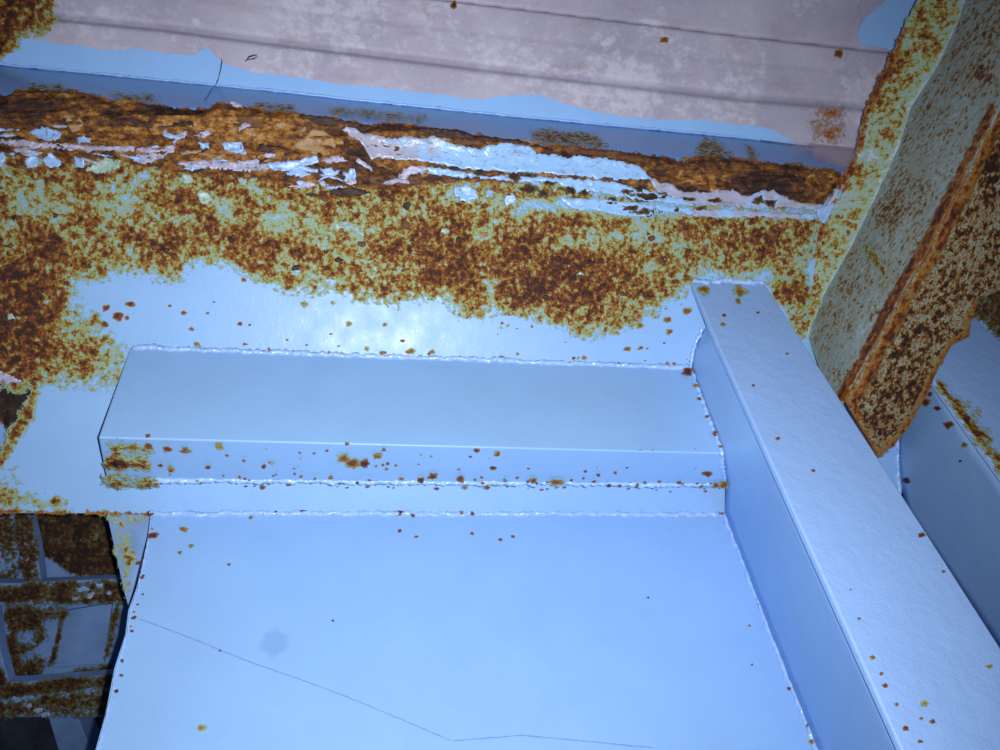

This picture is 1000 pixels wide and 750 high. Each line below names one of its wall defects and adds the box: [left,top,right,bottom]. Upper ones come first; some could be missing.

peeling [857,0,917,50]
peeling [0,122,372,205]
peeling [383,165,428,185]
peeling [454,184,516,206]
peeling [817,185,844,224]
rust [0,0,1000,476]
peeling [0,371,22,385]
rust [100,434,192,491]
rust [313,442,404,489]
rust [456,448,684,492]
rust [695,468,728,492]
rust [0,467,154,721]